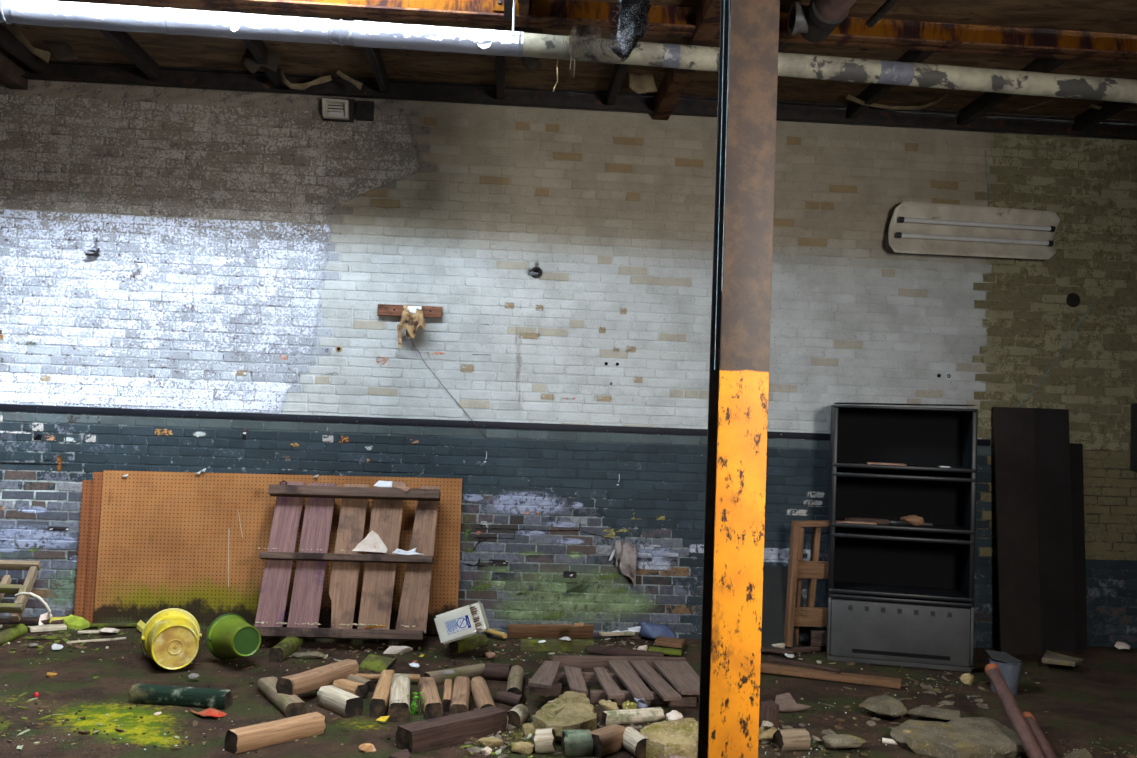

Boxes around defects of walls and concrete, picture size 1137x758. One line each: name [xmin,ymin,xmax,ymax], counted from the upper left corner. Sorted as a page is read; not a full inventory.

peeling [0,95,420,442]